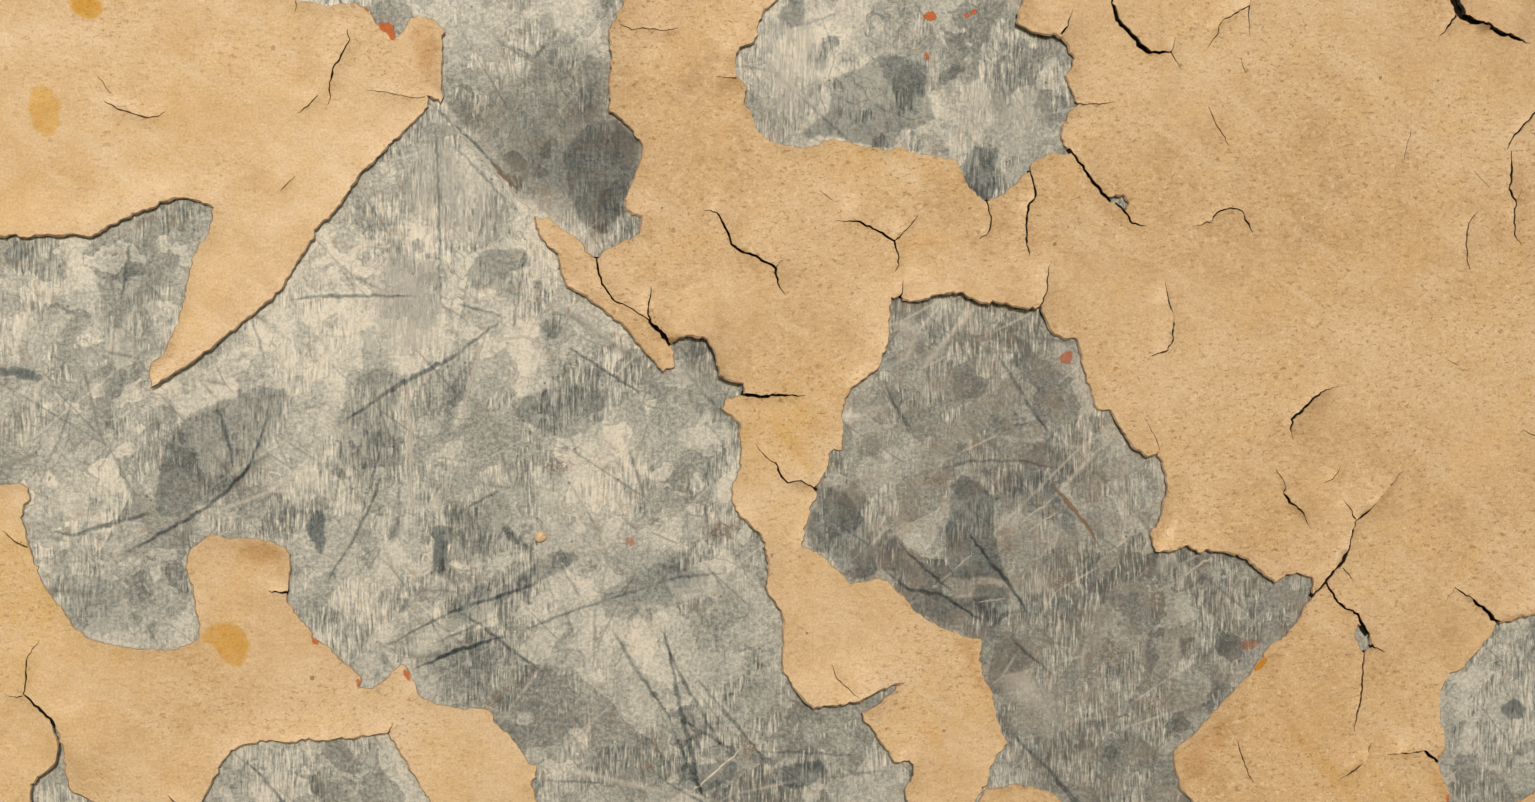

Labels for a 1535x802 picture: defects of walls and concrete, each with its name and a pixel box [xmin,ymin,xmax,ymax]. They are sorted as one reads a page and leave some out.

crack [1111,0,1174,58]
crack [1441,0,1526,43]
peeling [735,0,1077,201]
crack [704,210,784,293]
crack [819,190,917,298]
peeling [1108,196,1128,210]
peeling [0,0,912,802]
peeling [802,250,1312,802]
crack [1309,468,1384,722]
peeling [1355,625,1370,652]
peeling [1437,581,1535,802]
crack [1394,750,1438,763]